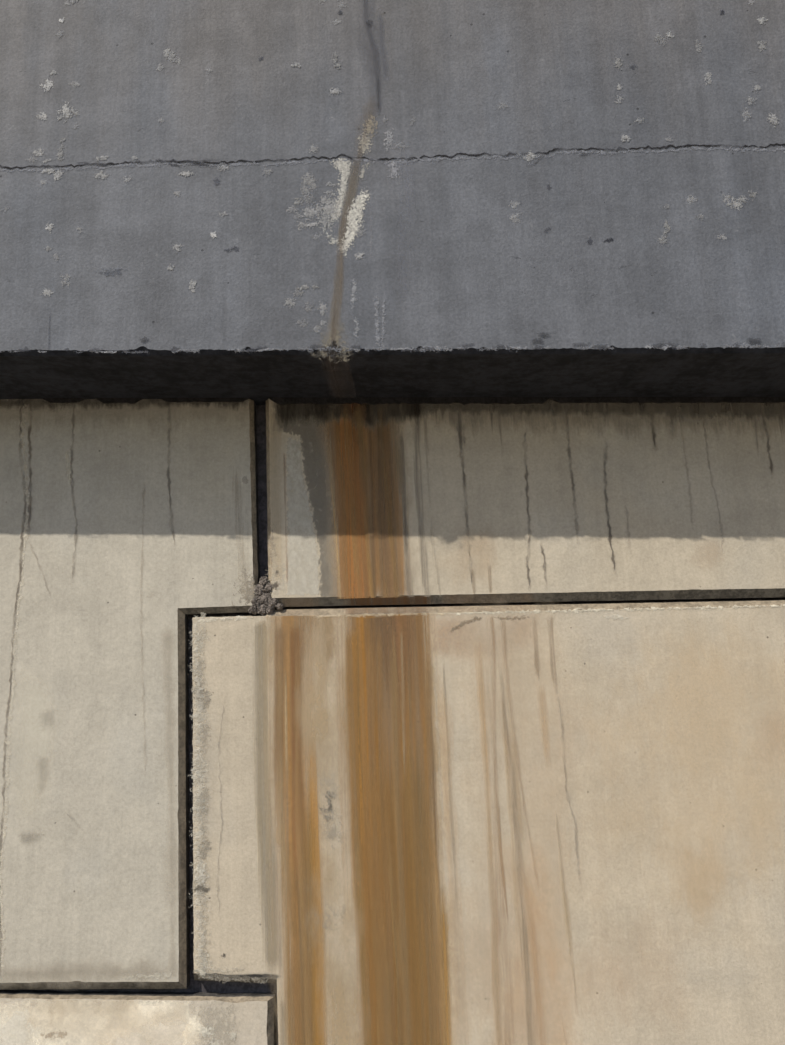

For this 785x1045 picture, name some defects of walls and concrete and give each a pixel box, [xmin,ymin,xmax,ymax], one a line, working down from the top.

rust [338,165,359,246]
crack [0,143,785,173]
crack [14,403,32,624]
damp [286,438,319,595]
damp [604,455,615,570]
spalling [194,532,285,656]
rust [269,275,451,1045]
damp [440,615,526,673]
spalling [300,604,785,619]
crack [0,654,14,860]
spalling [191,669,279,983]
damp [0,999,239,1045]